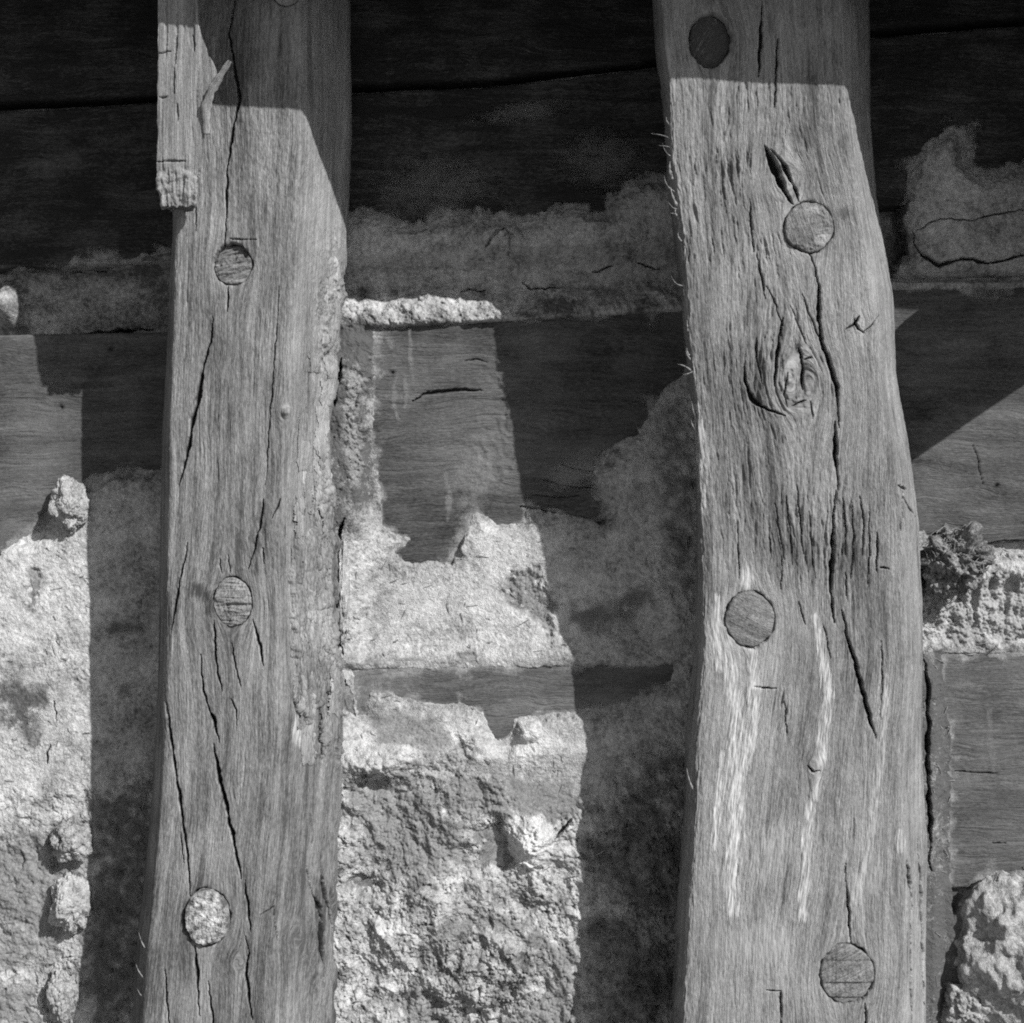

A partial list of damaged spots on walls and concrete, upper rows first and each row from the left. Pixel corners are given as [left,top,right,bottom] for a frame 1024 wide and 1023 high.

crack [225,2,257,246]
crack [765,151,797,202]
crack [913,209,1024,267]
crack [181,288,229,479]
crack [743,200,885,731]
crack [170,719,191,886]
crack [201,620,277,939]